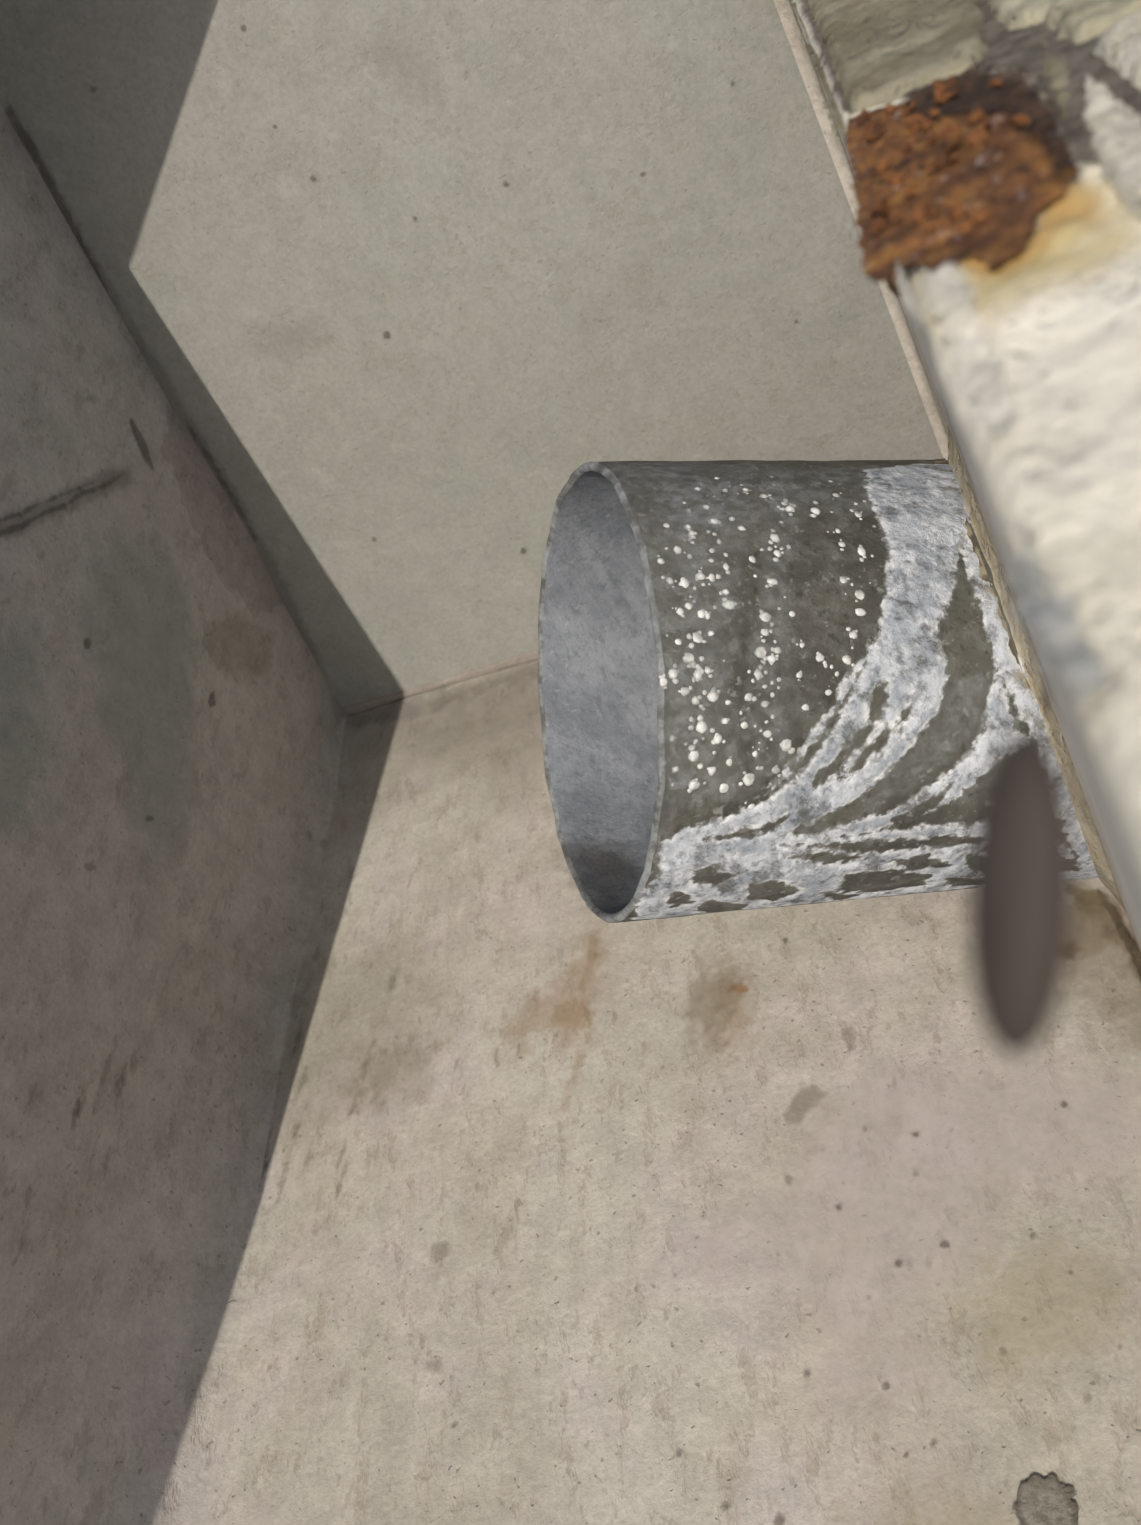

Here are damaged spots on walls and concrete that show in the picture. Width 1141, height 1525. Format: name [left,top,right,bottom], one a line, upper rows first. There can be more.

rust [845,62,1115,305]